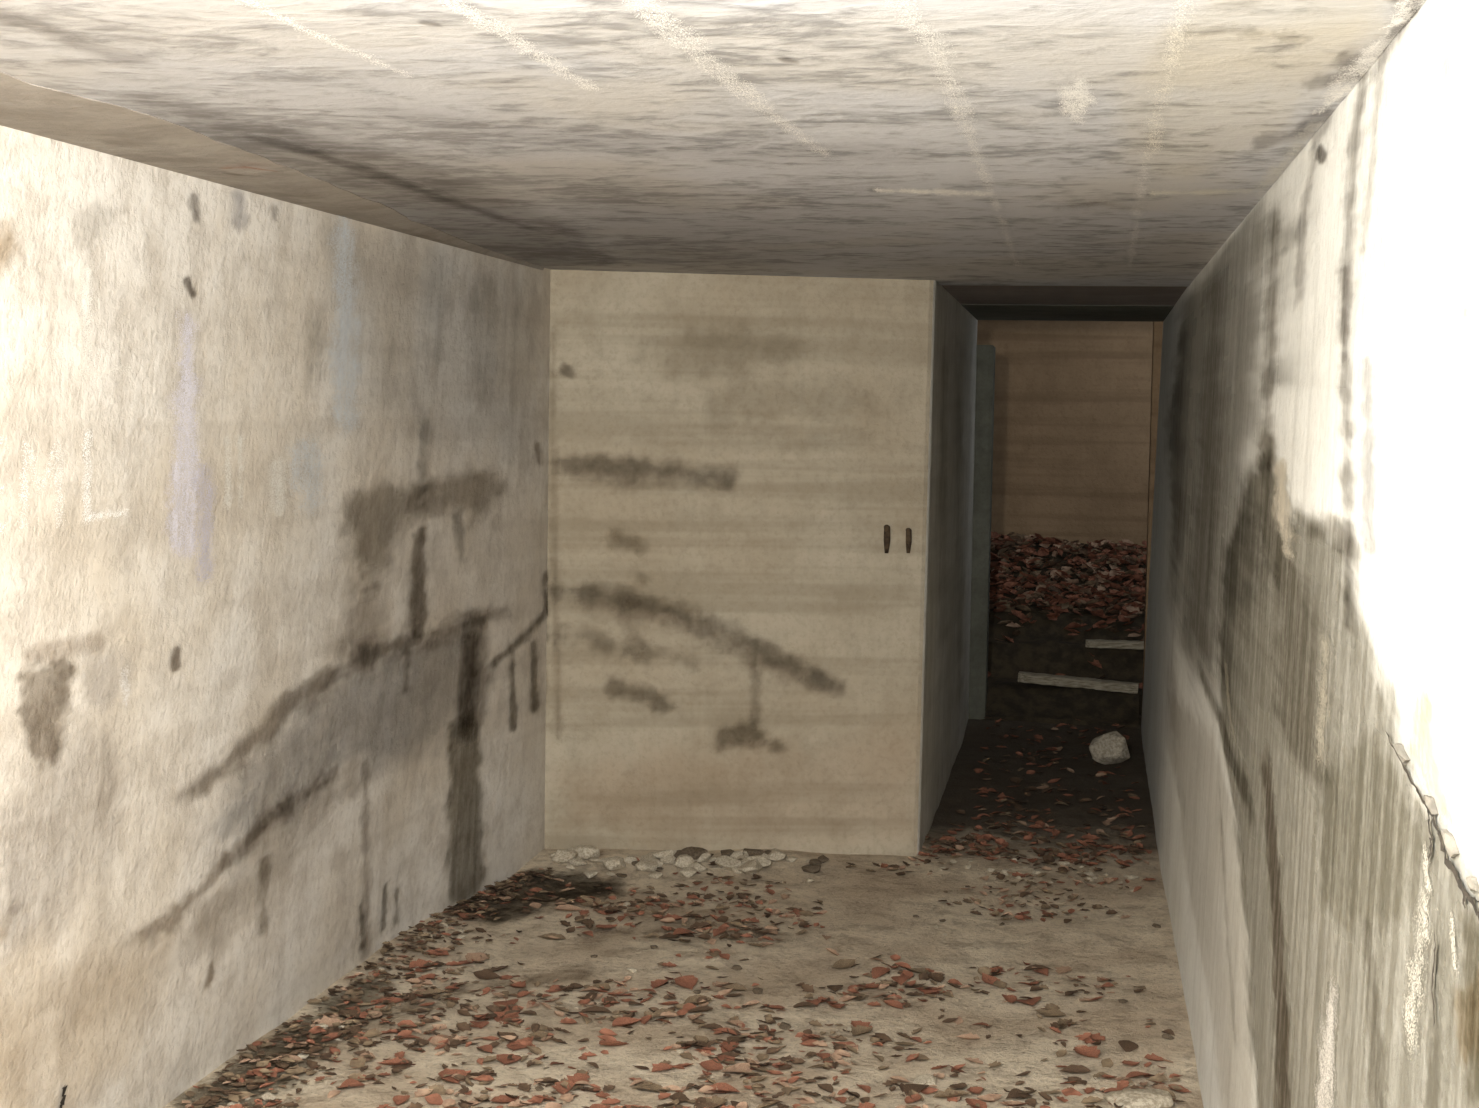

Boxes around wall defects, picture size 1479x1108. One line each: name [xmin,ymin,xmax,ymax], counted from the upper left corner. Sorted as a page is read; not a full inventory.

leakage [450,727,617,923]
leakage [1222,458,1479,1108]
crack [1386,732,1479,920]
crack [1429,931,1437,1024]